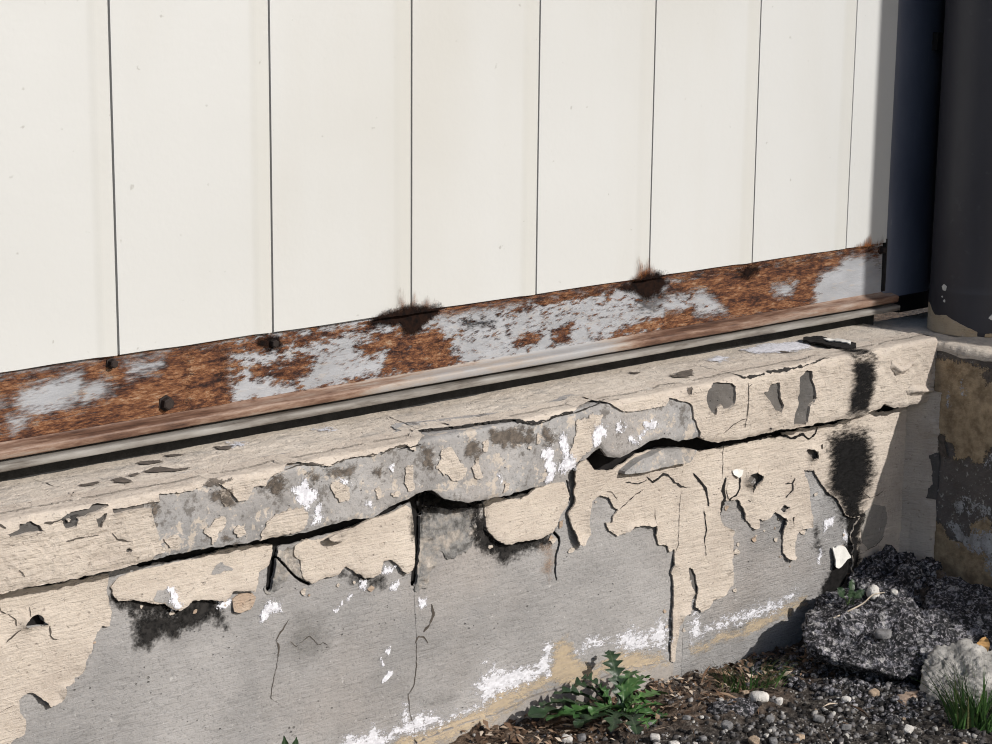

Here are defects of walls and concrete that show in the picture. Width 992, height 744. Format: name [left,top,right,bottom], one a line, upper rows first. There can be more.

rust [0,239,883,442]
peeling [927,302,992,338]
crack [285,399,619,470]
crack [607,357,829,555]
peeling [934,356,992,466]
crack [44,519,131,542]
crack [407,493,424,581]
peeling [8,369,887,744]
damp [411,491,551,564]
damp [109,596,232,650]
damp [687,588,809,653]
damp [341,614,675,744]